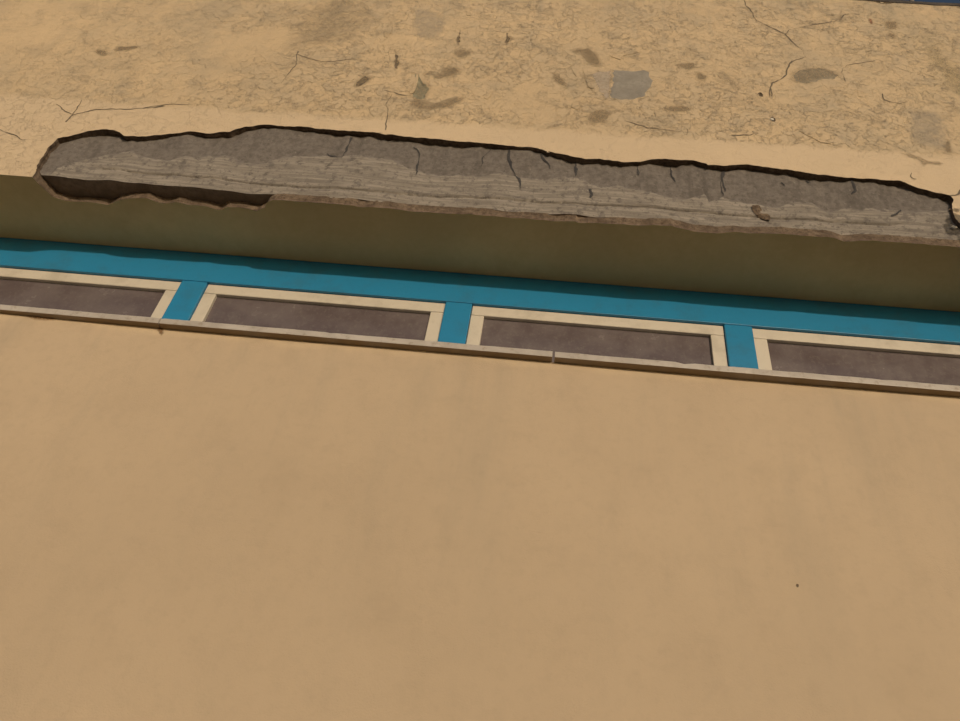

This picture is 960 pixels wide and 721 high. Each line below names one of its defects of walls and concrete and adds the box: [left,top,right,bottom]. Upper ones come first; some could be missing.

crack [744,0,855,98]
spalling [573,48,599,89]
peeling [610,70,653,100]
spalling [794,68,838,84]
crack [58,100,205,122]
spalling [588,110,609,123]
spalling [33,125,960,247]